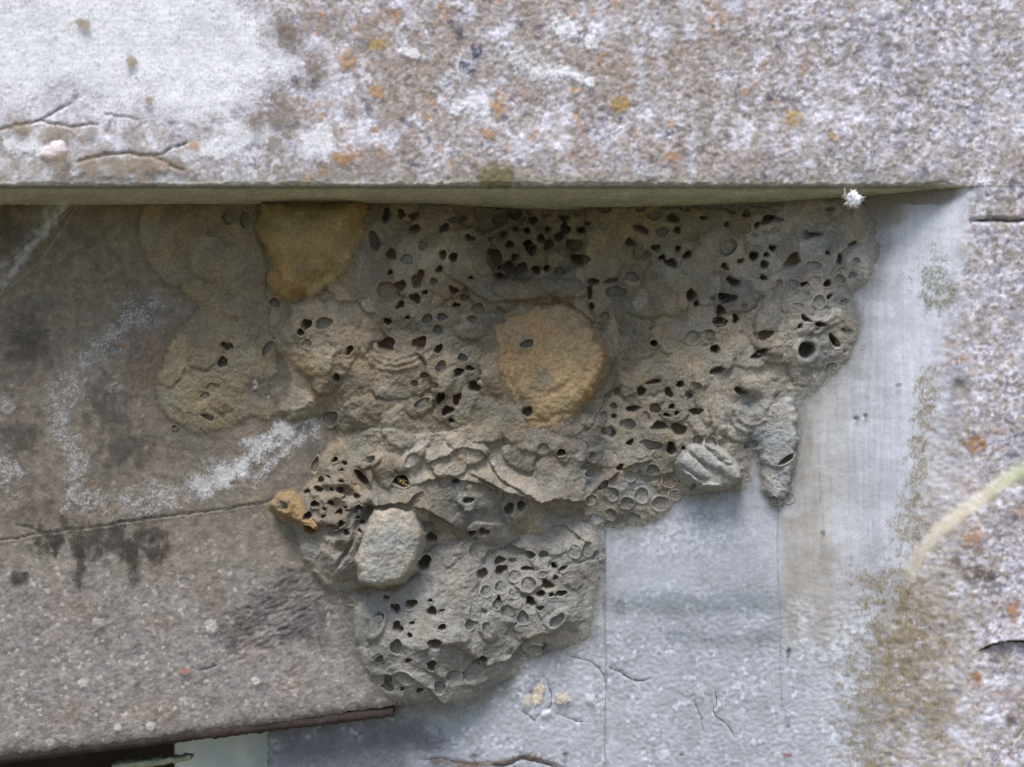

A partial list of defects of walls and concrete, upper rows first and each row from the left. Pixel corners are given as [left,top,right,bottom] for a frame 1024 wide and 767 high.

crack [0,104,185,169]
crack [974,216,1024,224]
leakage [0,293,320,588]
crack [0,500,271,541]
spalling [205,568,340,650]
crack [980,640,1024,651]
spalling [522,681,572,716]